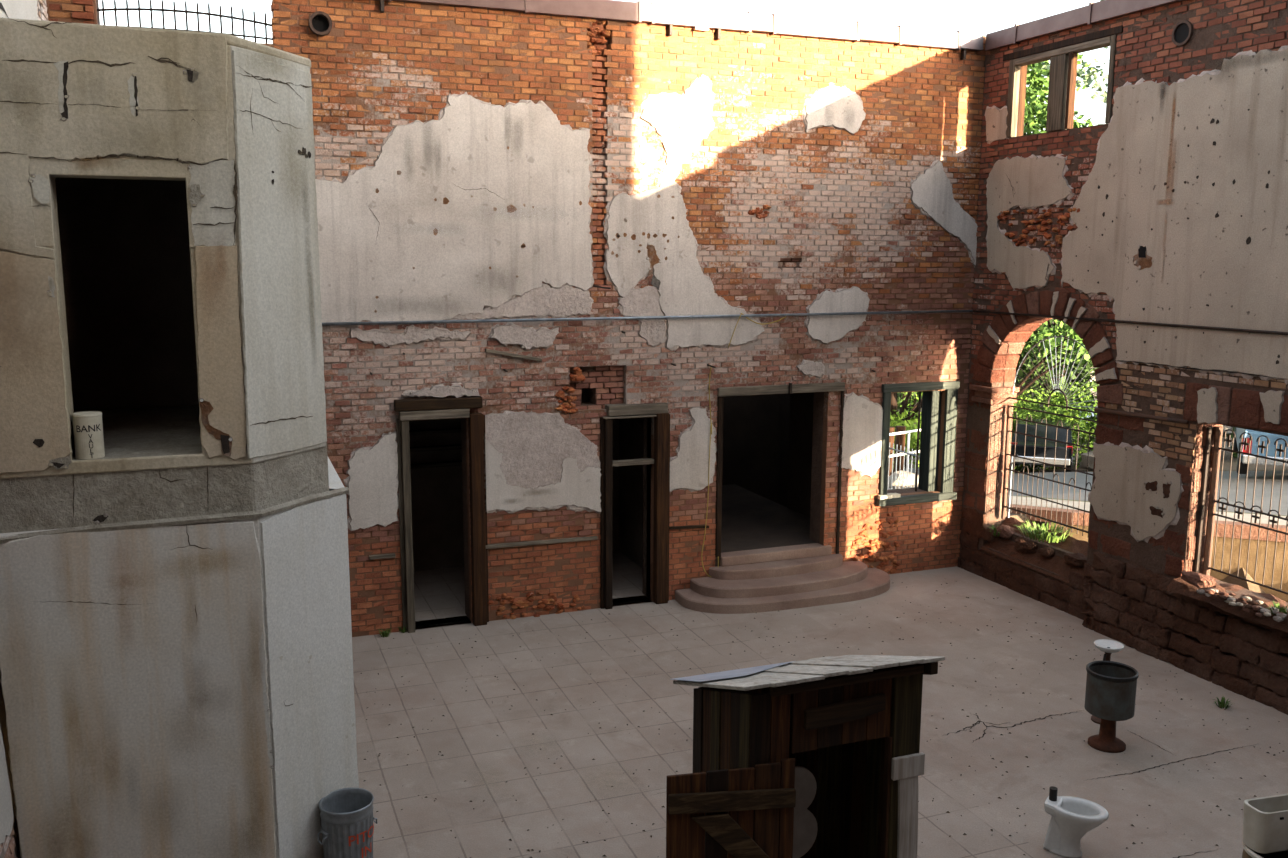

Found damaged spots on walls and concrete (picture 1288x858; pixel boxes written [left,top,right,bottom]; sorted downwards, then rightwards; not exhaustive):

crack [0,0,198,73]
spalling [582,20,611,56]
crack [0,100,114,108]
crack [161,66,313,132]
flaking render [802,83,866,135]
crack [0,152,238,245]
spalling [748,205,772,219]
spalling [997,208,1087,247]
flaking render [804,286,870,344]
flaking render [796,359,825,379]
crack [947,712,1077,743]